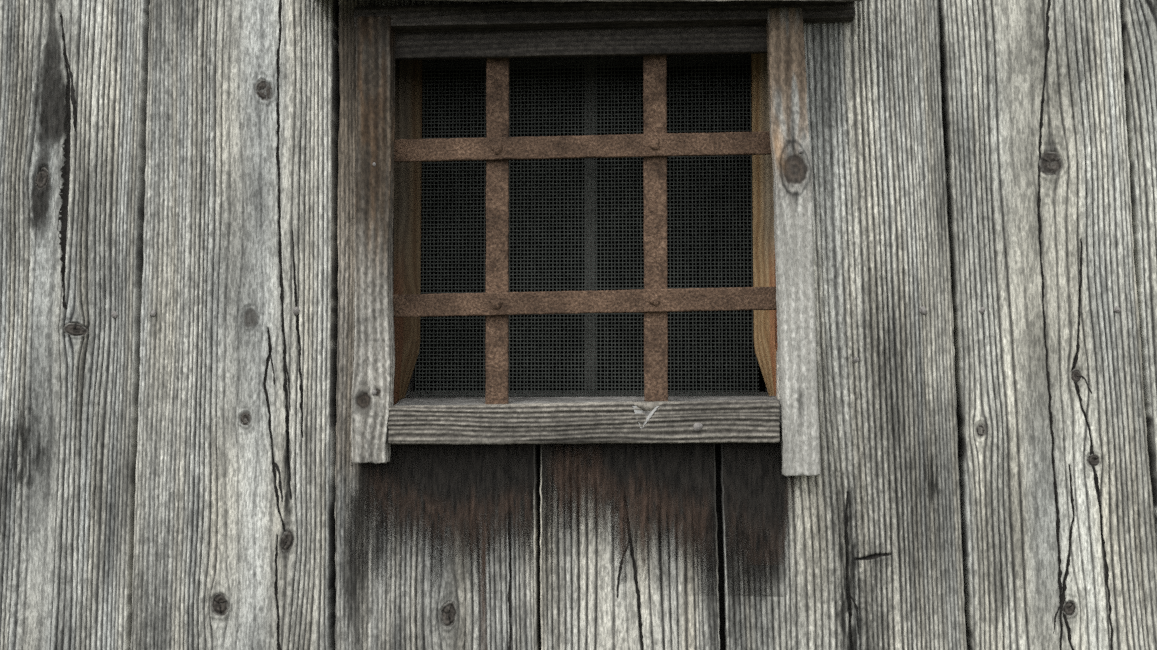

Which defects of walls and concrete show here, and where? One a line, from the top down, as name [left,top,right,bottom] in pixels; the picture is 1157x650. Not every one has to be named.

crack [263,0,303,650]